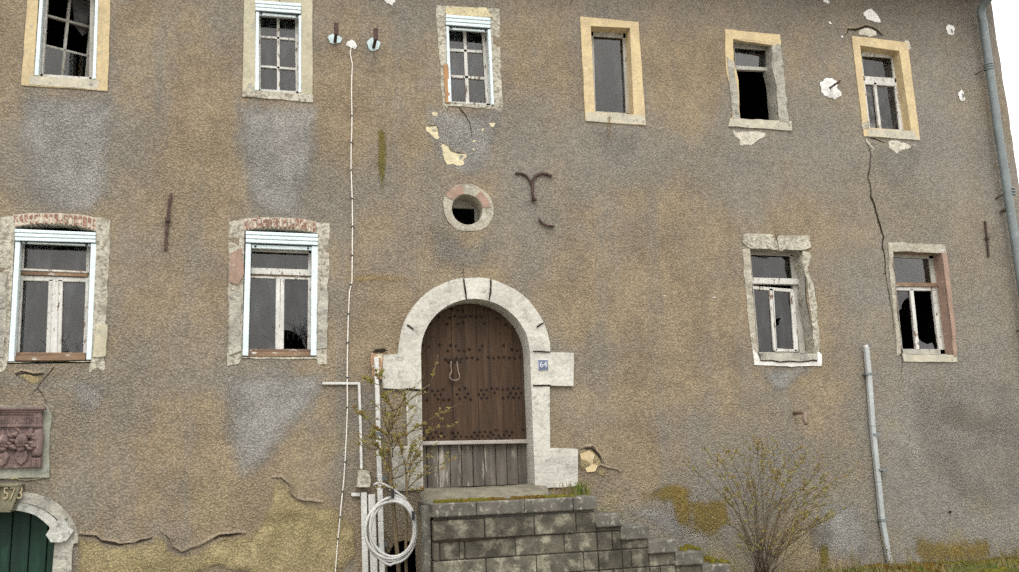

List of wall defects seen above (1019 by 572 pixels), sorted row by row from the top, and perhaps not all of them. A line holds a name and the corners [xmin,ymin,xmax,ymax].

flaking render [844,24,883,37]
water stain [28,102,106,208]
water stain [244,109,313,211]
flaking render [426,112,495,166]
flaking render [733,131,766,146]
flaking render [888,140,911,154]
crack [865,138,903,374]
flaking render [578,444,621,475]